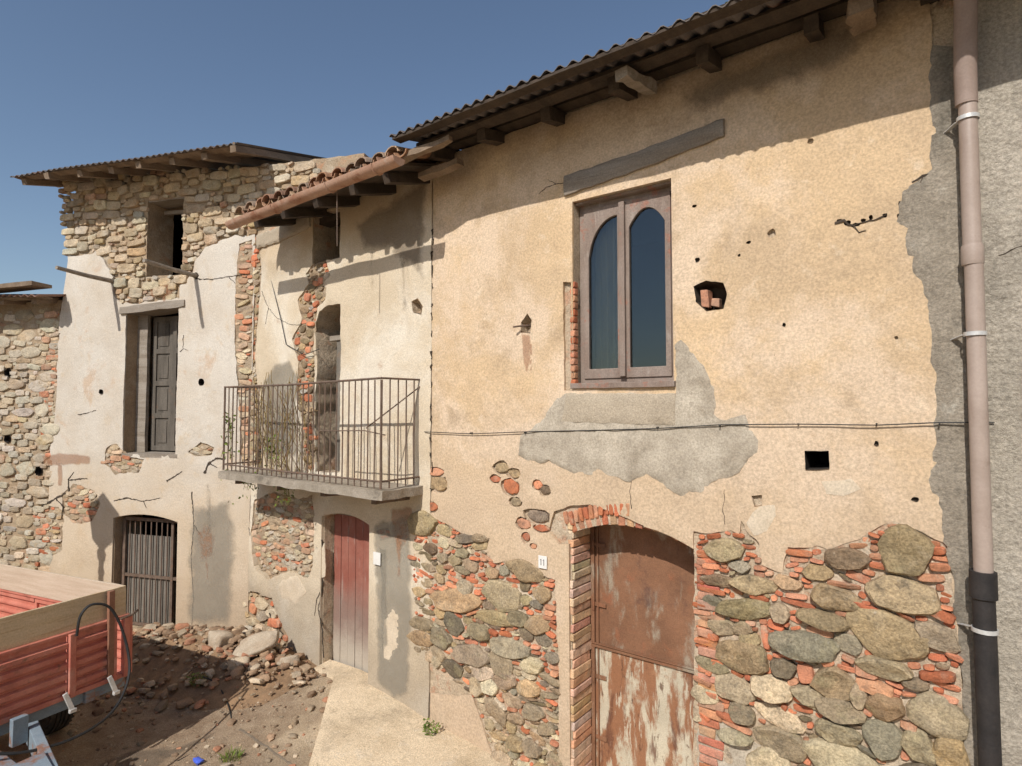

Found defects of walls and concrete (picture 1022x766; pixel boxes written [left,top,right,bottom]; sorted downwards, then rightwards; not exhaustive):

spalling [58,161,321,466]
spalling [293,261,330,470]
spalling [693,281,727,311]
crack [834,214,886,233]
spalling [26,484,101,562]
spalling [243,492,326,647]
damp [376,519,411,695]
spalling [429,468,447,491]
spalling [383,502,563,766]
spalling [490,462,551,549]
spalling [690,496,971,766]
peeling [805,451,860,496]